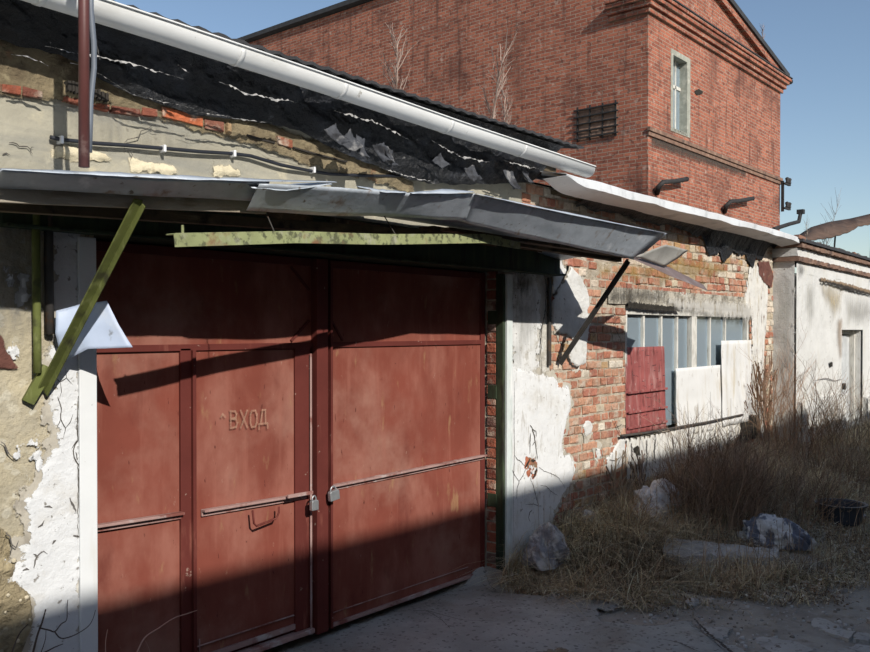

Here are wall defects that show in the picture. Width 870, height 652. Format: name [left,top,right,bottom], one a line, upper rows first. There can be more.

flaking render [0,39,78,106]
flaking render [51,144,78,162]
flaking render [90,71,414,192]
spalling [0,335,20,369]
peeling [3,266,31,309]
peeling [42,232,89,366]
crack [6,532,46,567]
peeling [0,354,80,652]
crack [57,374,79,534]
crack [513,385,563,521]
peeling [512,272,578,561]